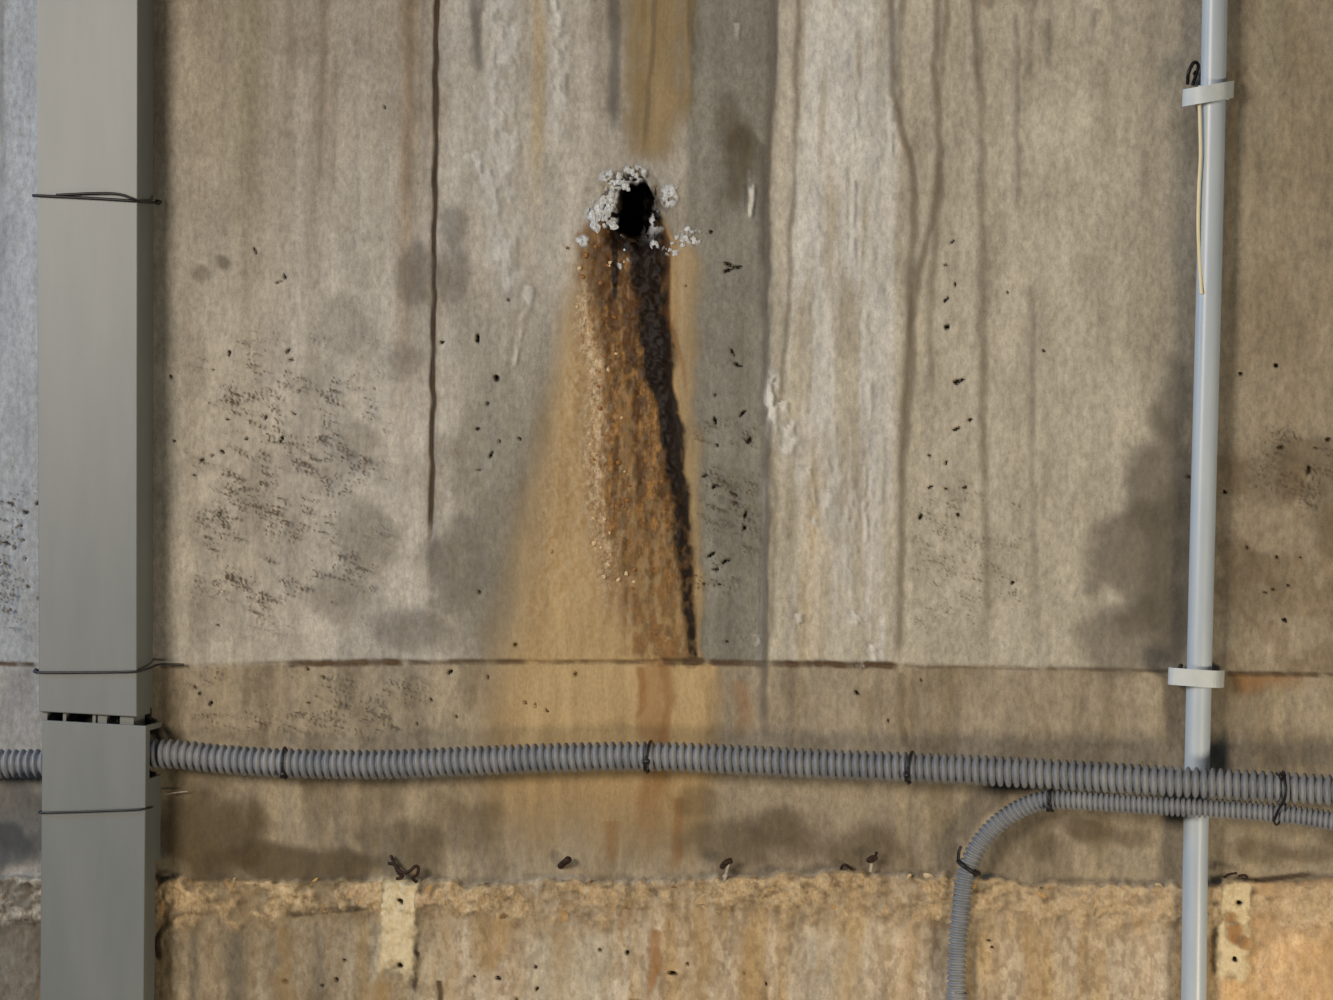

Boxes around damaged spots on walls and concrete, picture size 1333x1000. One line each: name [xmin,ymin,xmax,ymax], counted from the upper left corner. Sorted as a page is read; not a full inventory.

crack [428,0,439,526]
corrosion [492,173,717,749]
corrosion [500,767,708,826]
corrosion [649,931,661,989]